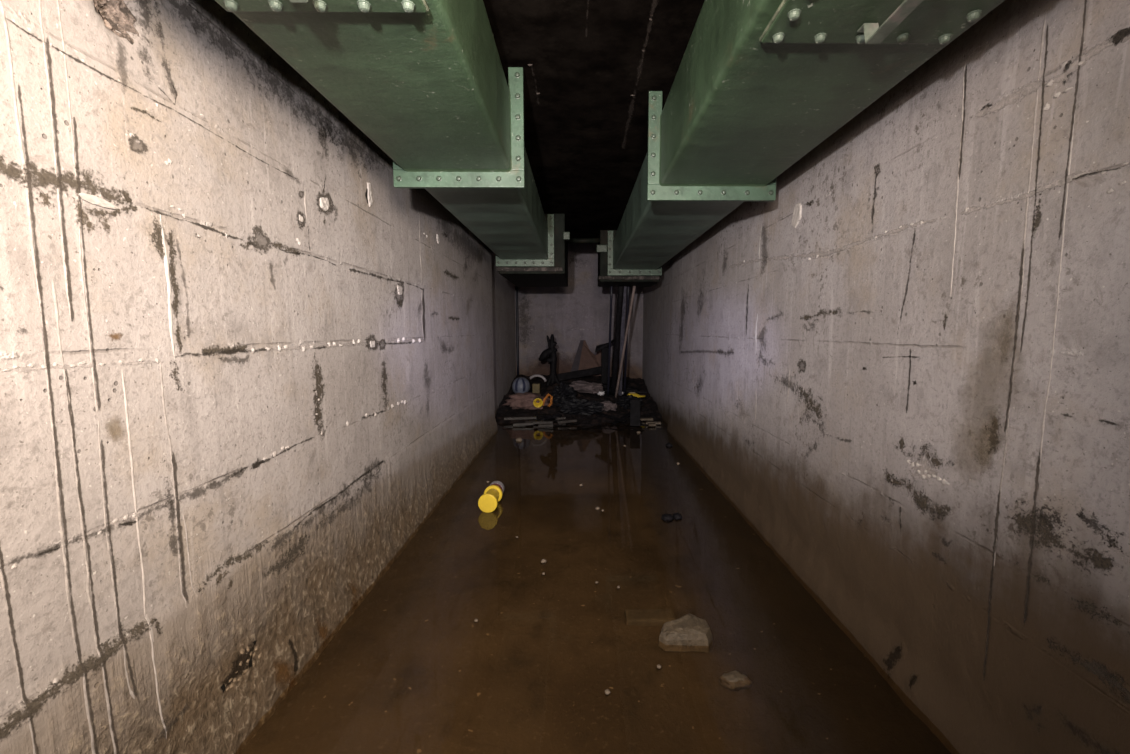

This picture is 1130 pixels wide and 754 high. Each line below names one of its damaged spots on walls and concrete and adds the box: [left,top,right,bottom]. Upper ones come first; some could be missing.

water stain [0,0,188,754]
spalling [93,0,177,105]
water stain [149,214,385,604]
water stain [168,0,387,177]
crack [961,162,1129,215]
water stain [983,0,1130,680]